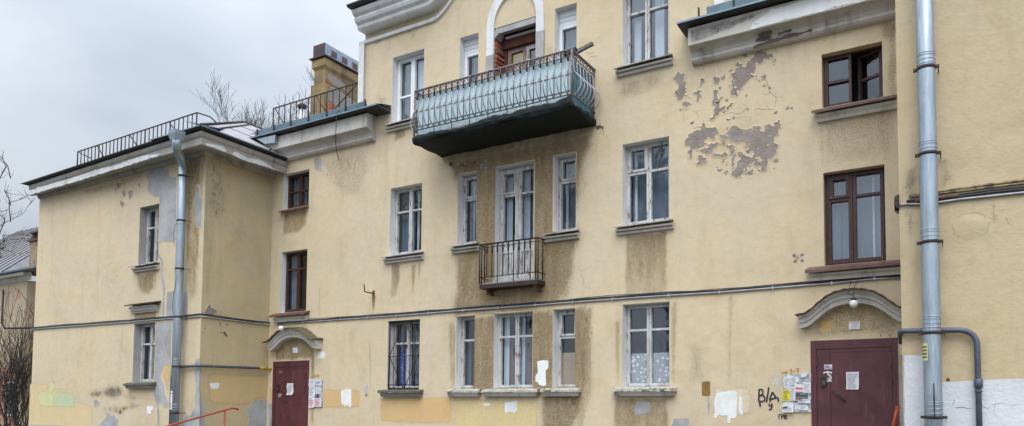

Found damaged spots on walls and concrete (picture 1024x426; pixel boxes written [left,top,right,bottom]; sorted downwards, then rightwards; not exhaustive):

peeling [671,0,865,179]
flaking render [29,154,205,426]
leakage [391,262,421,296]
leakage [444,127,595,426]
leakage [624,231,669,295]